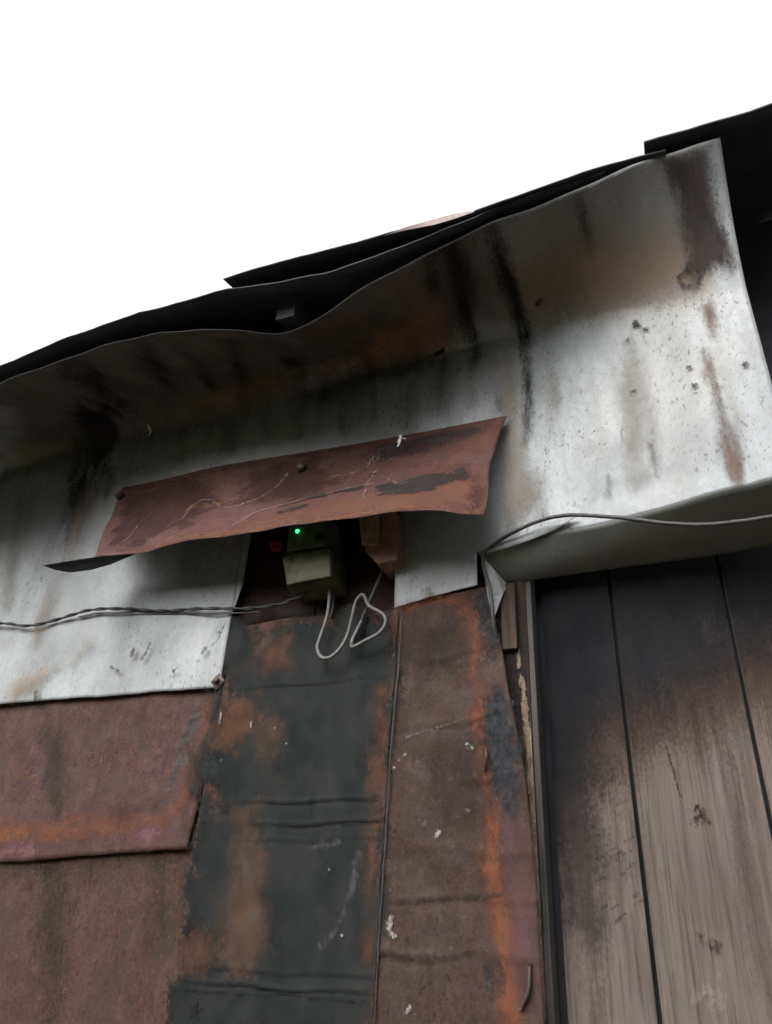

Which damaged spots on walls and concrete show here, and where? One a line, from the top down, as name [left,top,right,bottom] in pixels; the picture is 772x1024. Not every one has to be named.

water stain [667,150,734,284]
rust [160,468,488,544]
rust [0,673,224,1024]
rust [399,593,526,1024]
water stain [552,639,772,838]